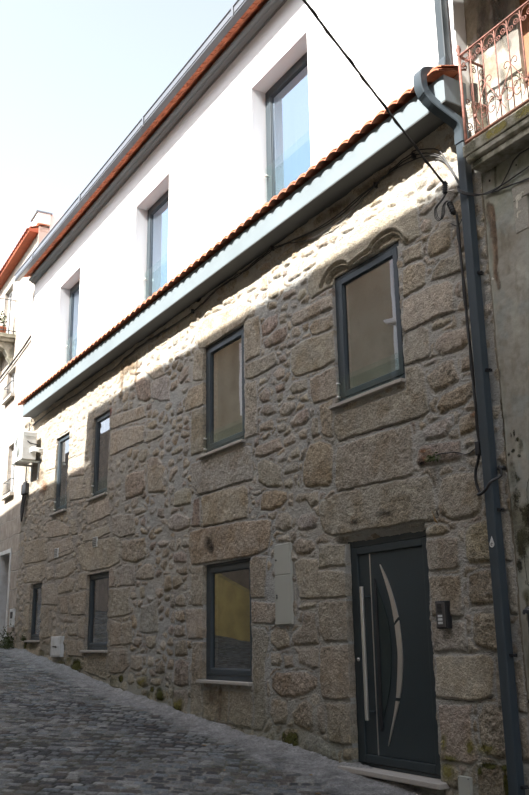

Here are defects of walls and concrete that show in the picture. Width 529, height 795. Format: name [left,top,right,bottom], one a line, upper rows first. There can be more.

leakage [504,430,529,572]